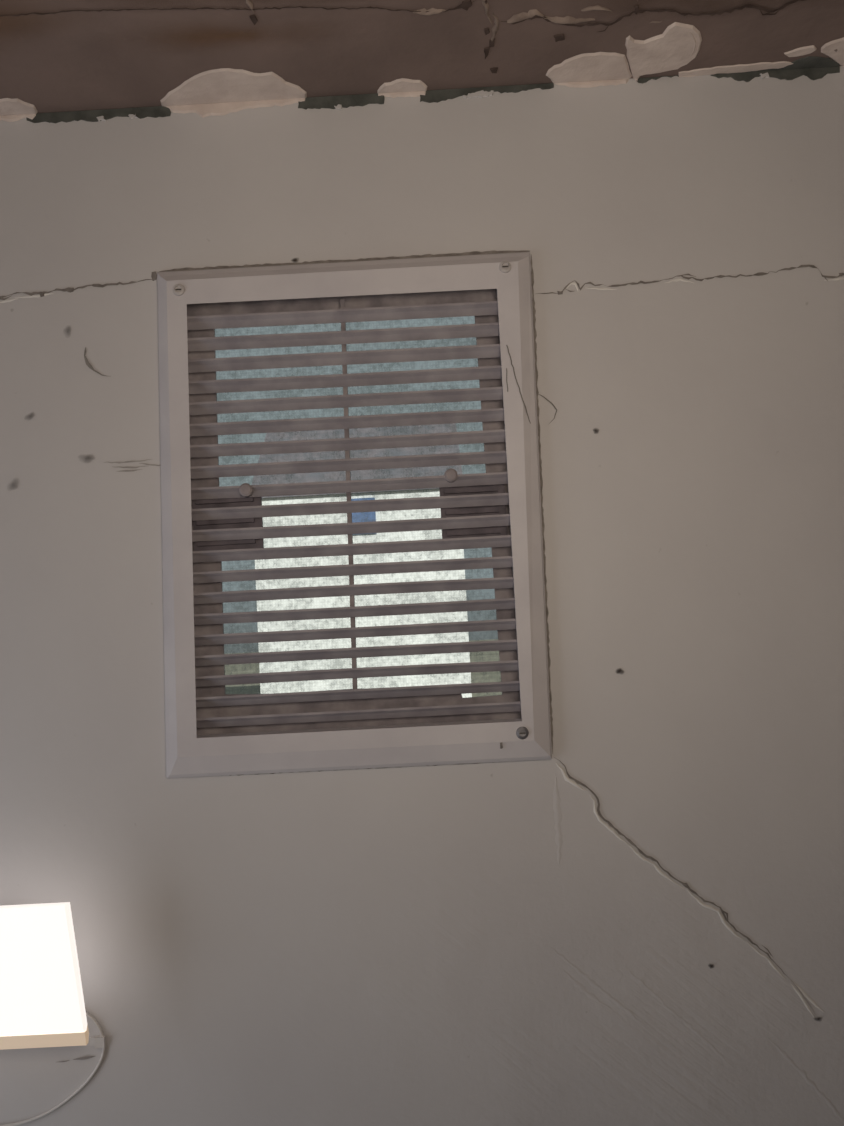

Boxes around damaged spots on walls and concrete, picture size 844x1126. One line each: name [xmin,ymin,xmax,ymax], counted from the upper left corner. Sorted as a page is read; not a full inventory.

crack [0,1,474,16]
crack [501,0,805,32]
peeling [420,0,554,103]
peeling [636,75,679,84]
peeling [711,49,840,82]
peeling [26,106,171,124]
peeling [298,93,385,110]
crack [0,272,157,303]
crack [537,265,844,295]
crack [554,757,824,1018]